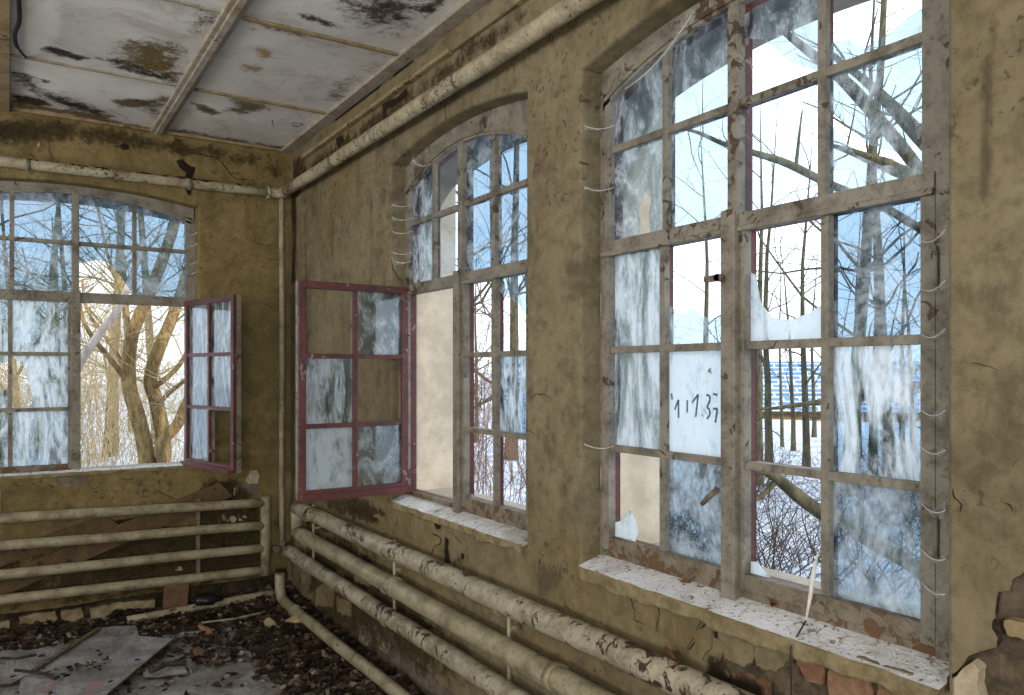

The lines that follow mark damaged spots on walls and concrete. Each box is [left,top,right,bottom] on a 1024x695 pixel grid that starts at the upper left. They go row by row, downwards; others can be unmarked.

leakage [42,37,184,83]
leakage [340,0,443,33]
leakage [0,72,284,195]
leakage [291,13,525,284]
leakage [306,522,387,568]
leakage [327,498,385,523]
leakage [306,547,444,639]
leakage [308,574,454,683]
spalling [635,601,893,695]
peeling [847,653,914,675]
spalling [946,572,1024,695]